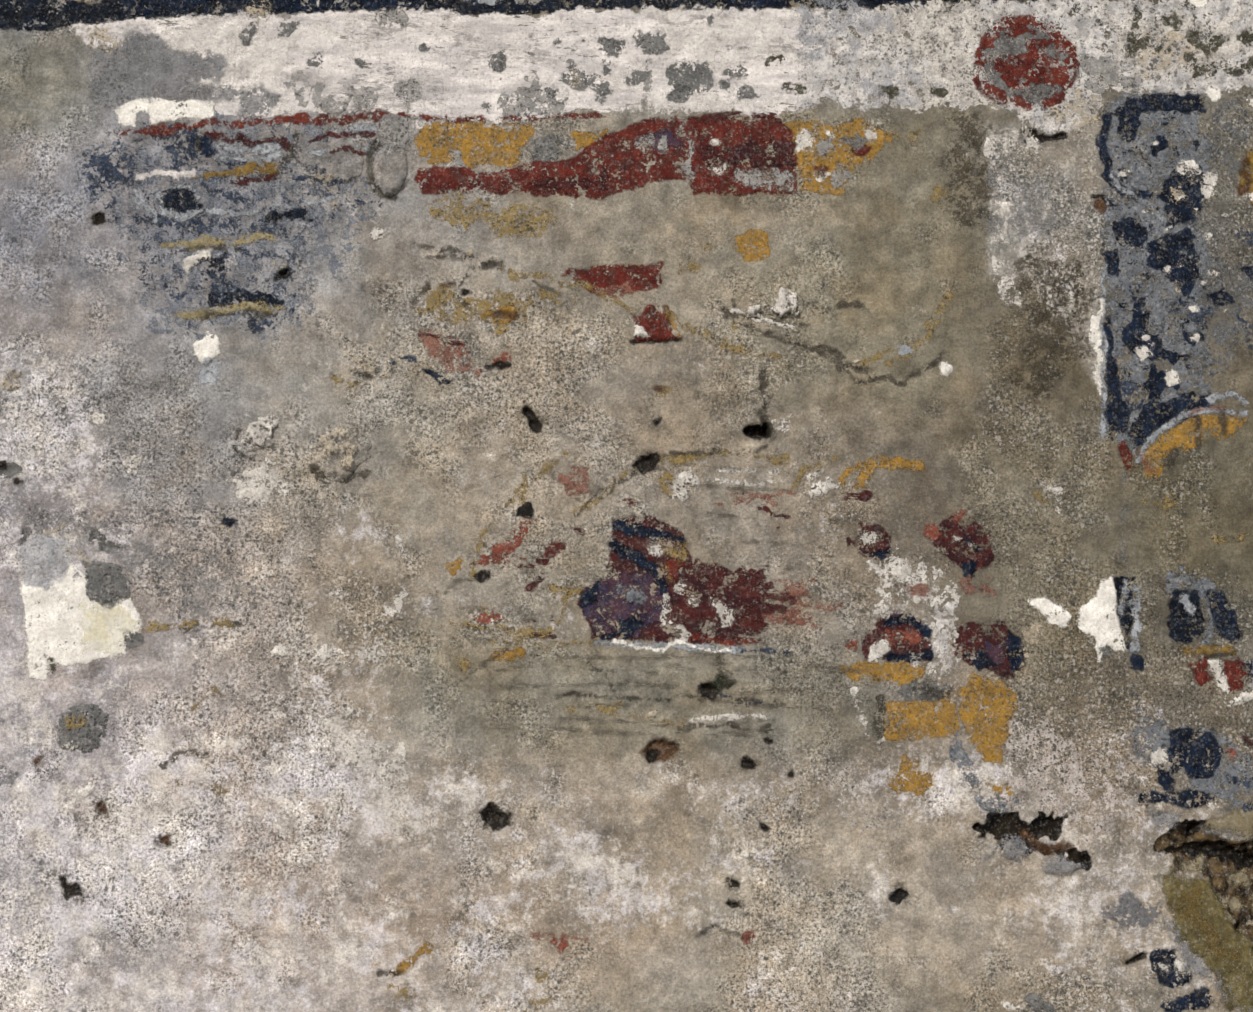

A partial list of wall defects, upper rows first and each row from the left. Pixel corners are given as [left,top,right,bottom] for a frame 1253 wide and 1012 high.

spalling [972,811,1092,876]
spalling [1153,819,1253,941]